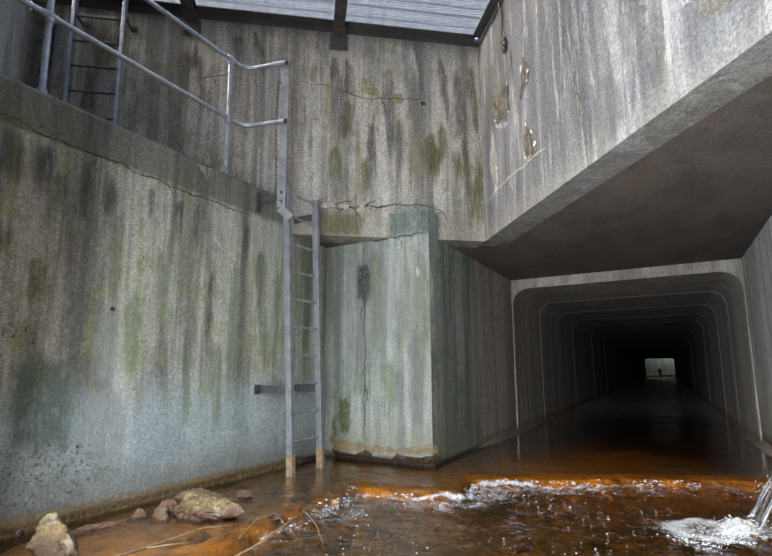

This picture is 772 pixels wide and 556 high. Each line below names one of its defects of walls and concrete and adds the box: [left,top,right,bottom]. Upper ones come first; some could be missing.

crack [0,113,247,215]
crack [314,84,419,114]
water stain [384,87,402,167]
spalling [493,81,510,128]
crack [488,147,544,202]
spalling [519,56,528,100]
spalling [523,123,538,159]
crack [332,200,448,221]
crack [360,232,427,443]